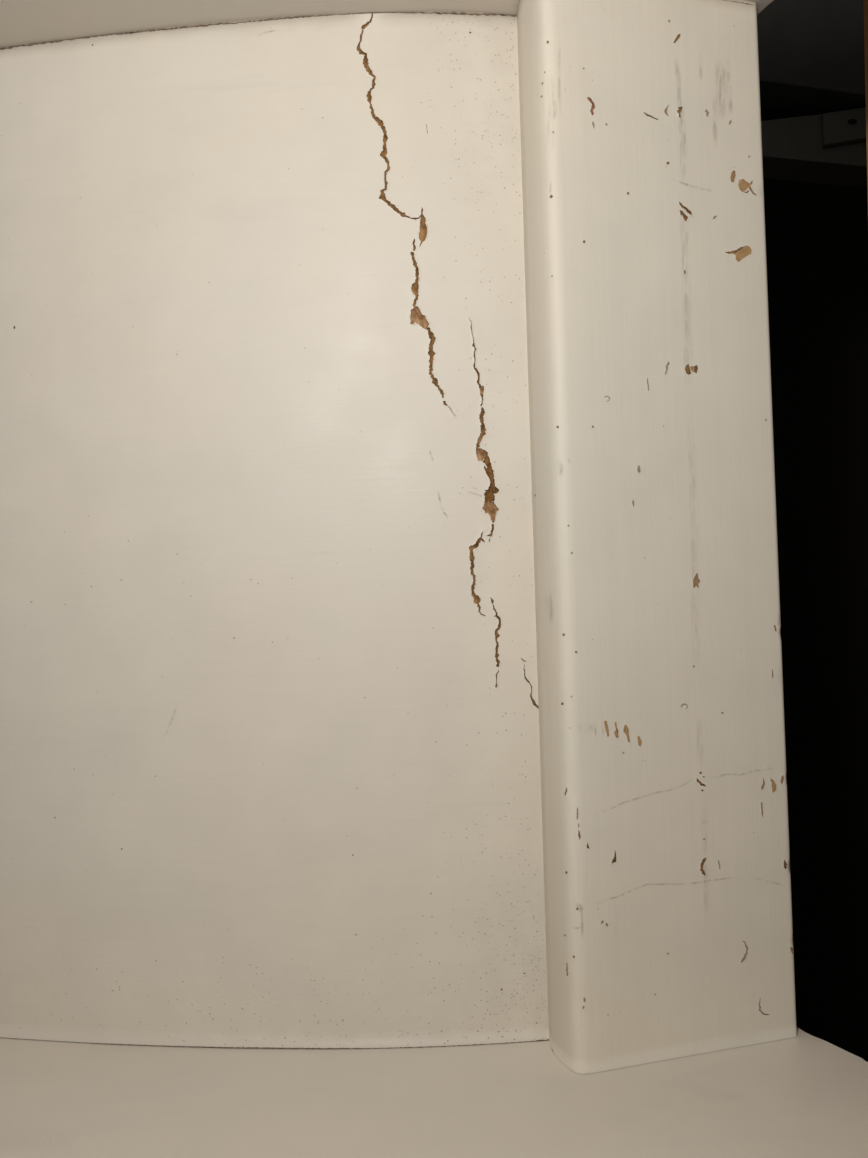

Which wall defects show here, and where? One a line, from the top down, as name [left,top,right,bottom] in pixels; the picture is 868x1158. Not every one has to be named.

peeling [730,171,757,196]
peeling [725,245,751,262]
crack [0,12,538,708]
peeling [604,721,642,754]